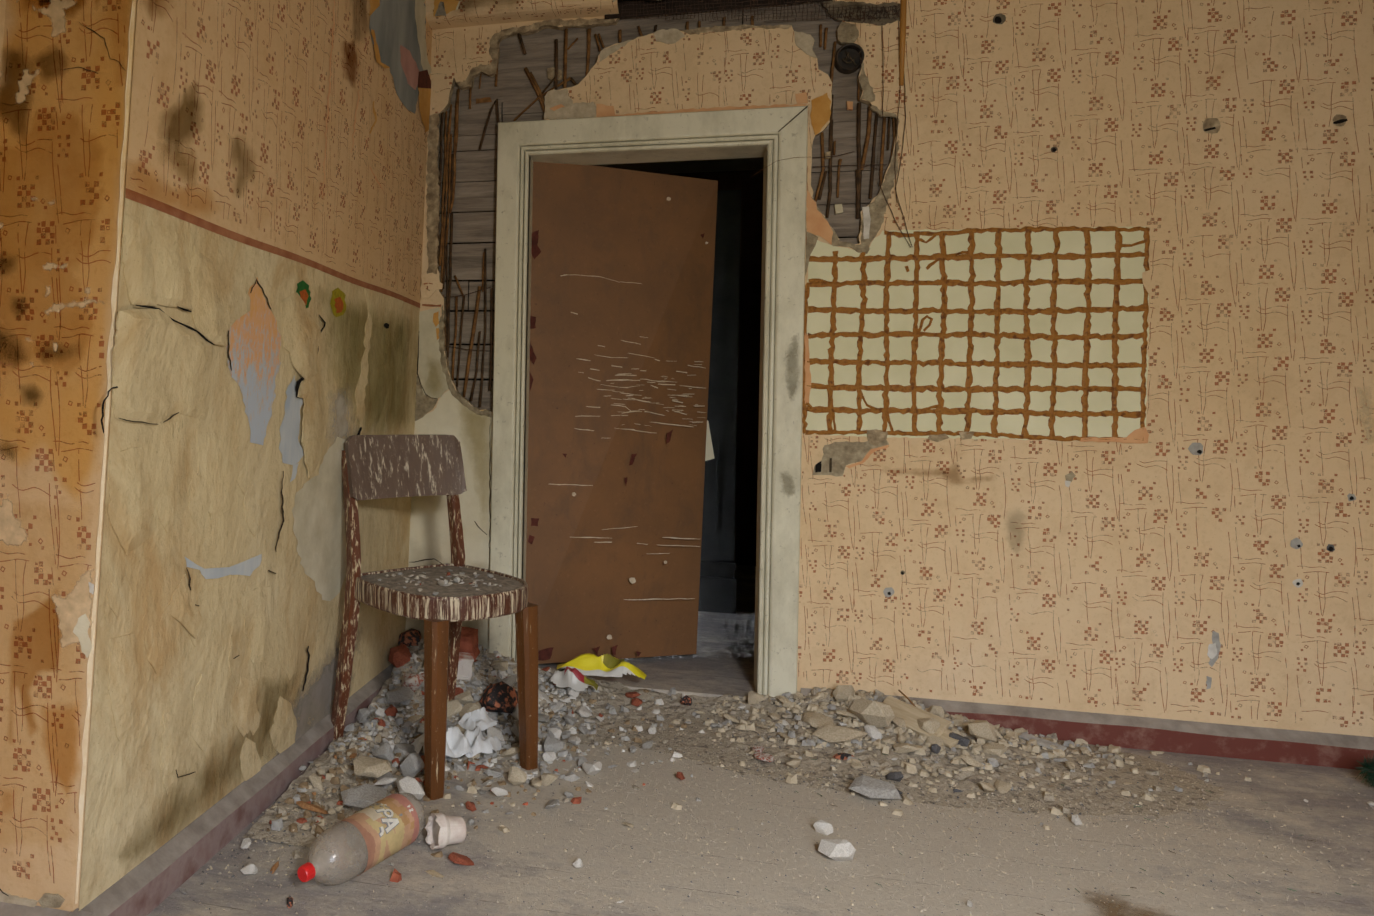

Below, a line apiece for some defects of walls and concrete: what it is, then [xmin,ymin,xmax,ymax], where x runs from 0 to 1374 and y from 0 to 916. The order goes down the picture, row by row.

peeling [0,0,136,908]
peeling [226,278,348,601]
flaking render [369,0,900,570]
peeling [462,619,489,650]
water stain [1092,898,1156,916]